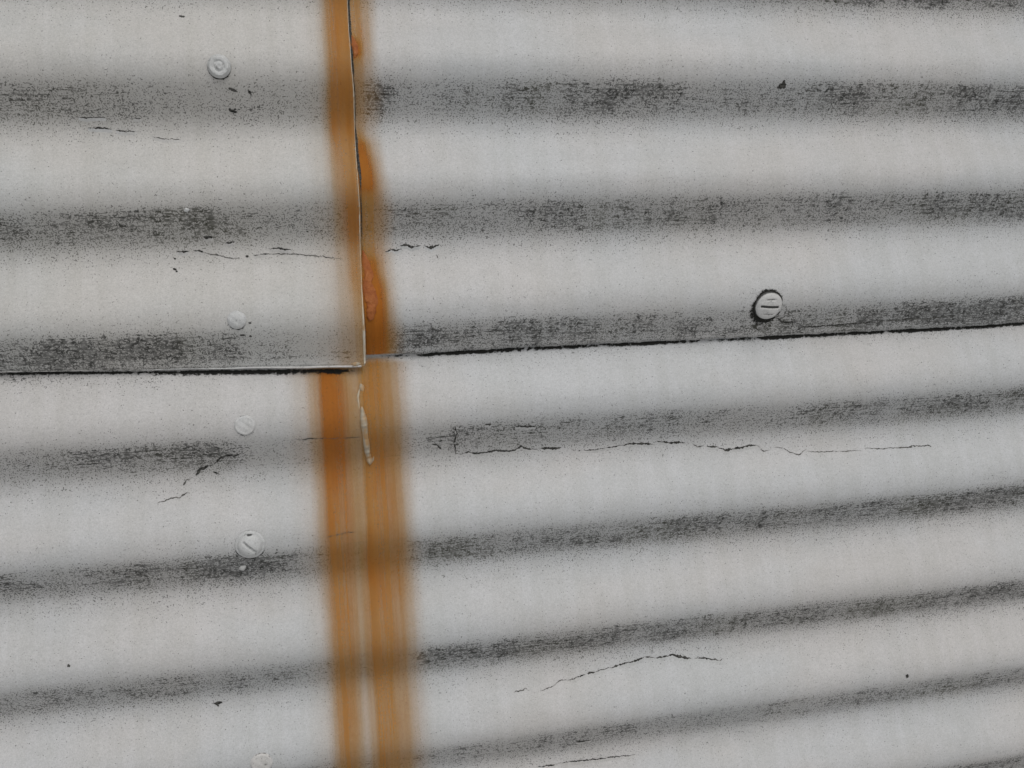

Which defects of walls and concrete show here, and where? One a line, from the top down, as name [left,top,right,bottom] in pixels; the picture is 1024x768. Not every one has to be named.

crack [177,0,439,259]
rust [319,0,406,768]
crack [432,424,932,457]
crack [158,452,242,503]
crack [515,654,723,692]